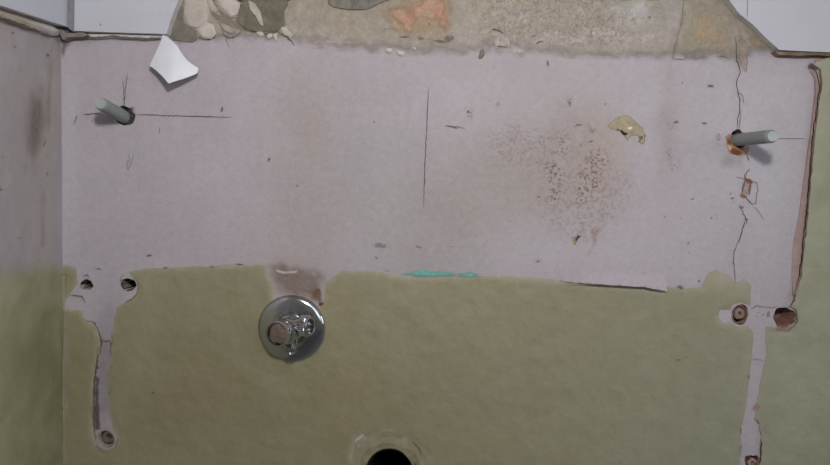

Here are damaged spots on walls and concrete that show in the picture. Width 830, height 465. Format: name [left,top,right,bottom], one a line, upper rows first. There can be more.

peeling [149,35,199,84]
flaking render [207,0,258,37]
flaking render [282,0,772,60]
crack [735,37,748,131]
peeling [609,115,646,144]
corrosion [716,131,750,161]
peeling [791,63,821,301]
crack [730,169,763,283]
peeling [559,264,667,291]
peeling [91,331,103,441]